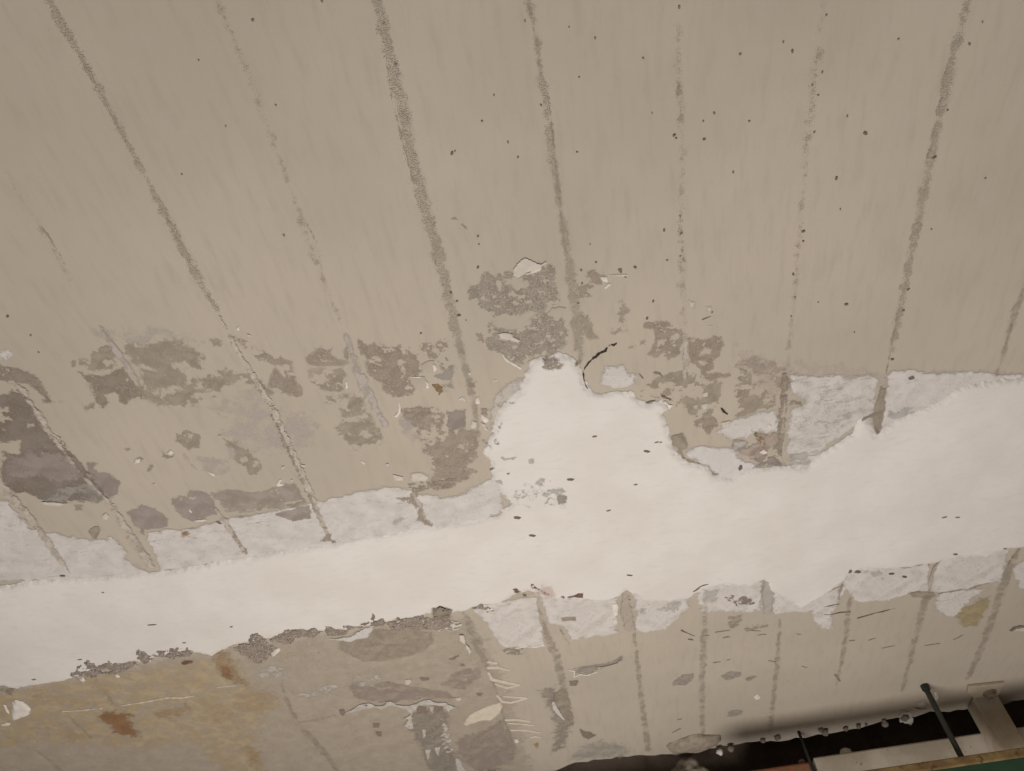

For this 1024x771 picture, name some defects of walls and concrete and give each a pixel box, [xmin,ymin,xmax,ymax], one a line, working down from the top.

peeling [0,364,312,539]
peeling [71,327,489,526]
peeling [467,258,569,370]
crack [582,343,617,389]
peeling [577,268,627,298]
peeling [580,300,630,340]
peeling [629,300,798,475]
spalling [70,642,192,682]
corrosion [0,650,279,771]
peeling [234,607,483,703]